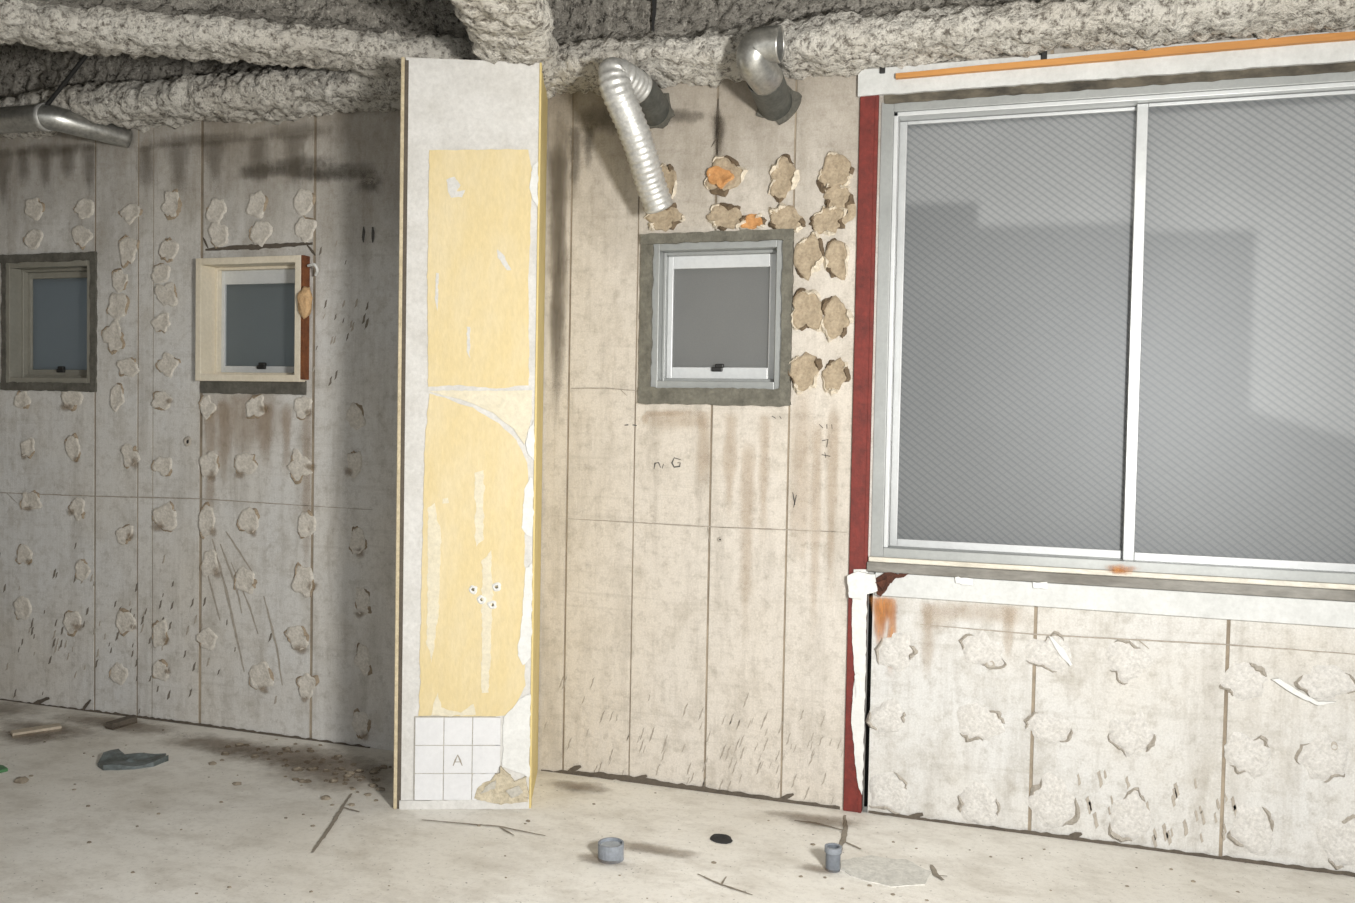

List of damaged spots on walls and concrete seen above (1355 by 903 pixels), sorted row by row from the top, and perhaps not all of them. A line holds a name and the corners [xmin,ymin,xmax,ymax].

spalling [205,198,229,248]
spalling [246,191,273,247]
spalling [293,188,337,255]
peeling [648,163,686,231]
peeling [703,154,800,231]
spalling [791,151,856,343]
spalling [60,391,83,411]
spalling [245,394,265,419]
peeling [788,357,851,396]
peeling [418,149,547,805]
rust [875,572,908,638]
spalling [3,581,206,700]